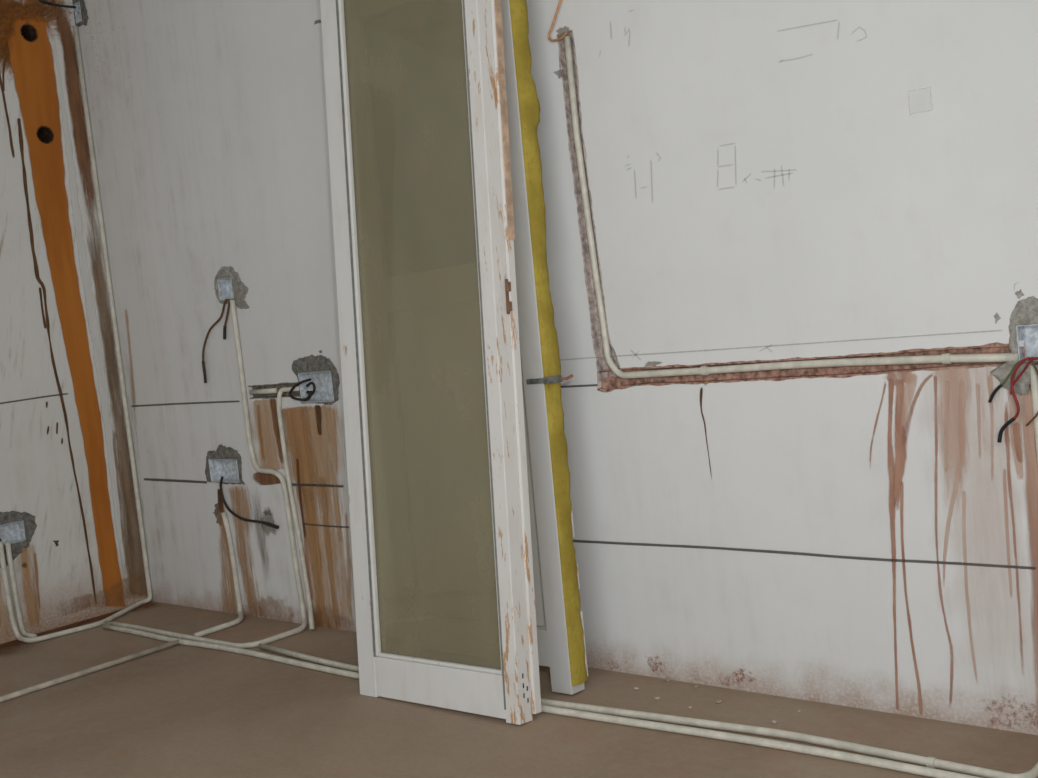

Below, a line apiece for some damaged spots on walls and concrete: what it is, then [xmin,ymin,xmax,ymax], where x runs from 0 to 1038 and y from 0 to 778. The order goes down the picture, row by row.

rust [0,0,155,654]
rust [217,488,265,615]
rust [253,399,351,628]
crack [700,381,712,478]
rust [870,368,992,714]
rust [1003,389,1038,671]